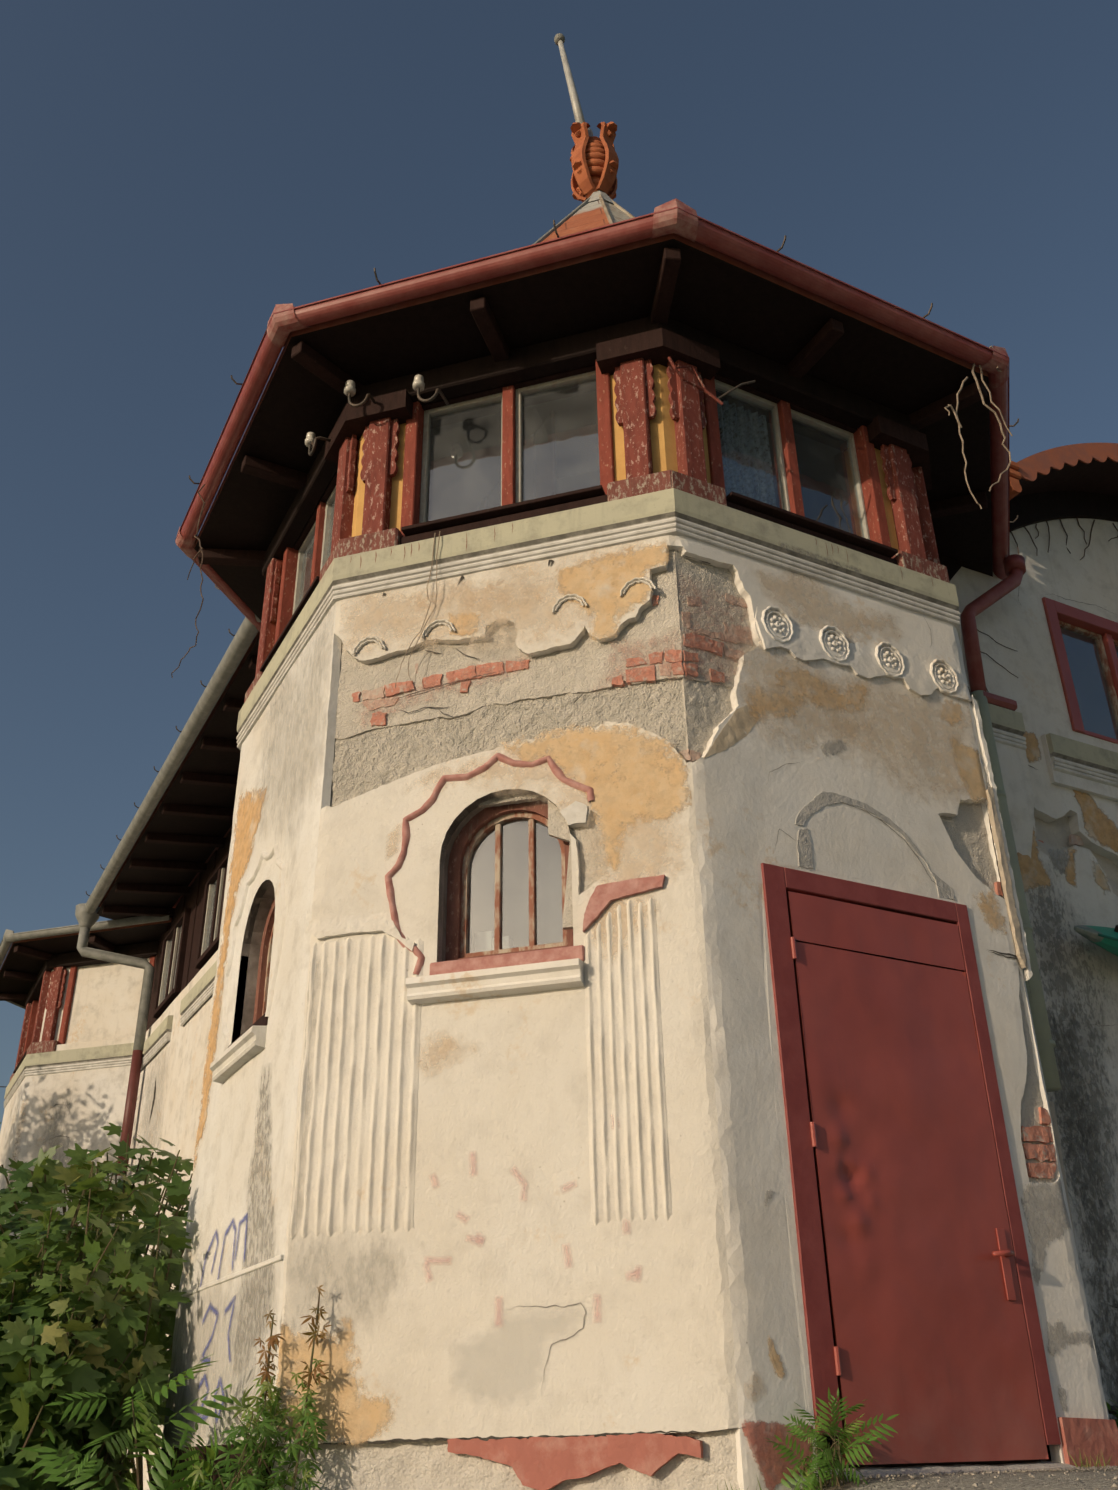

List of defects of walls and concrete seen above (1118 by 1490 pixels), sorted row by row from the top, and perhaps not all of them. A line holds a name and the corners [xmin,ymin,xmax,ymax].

flaking render [330,543,759,930]
flaking render [940,695,1118,1183]
damp [1021,884,1118,1417]
flaking render [275,1320,813,1490]